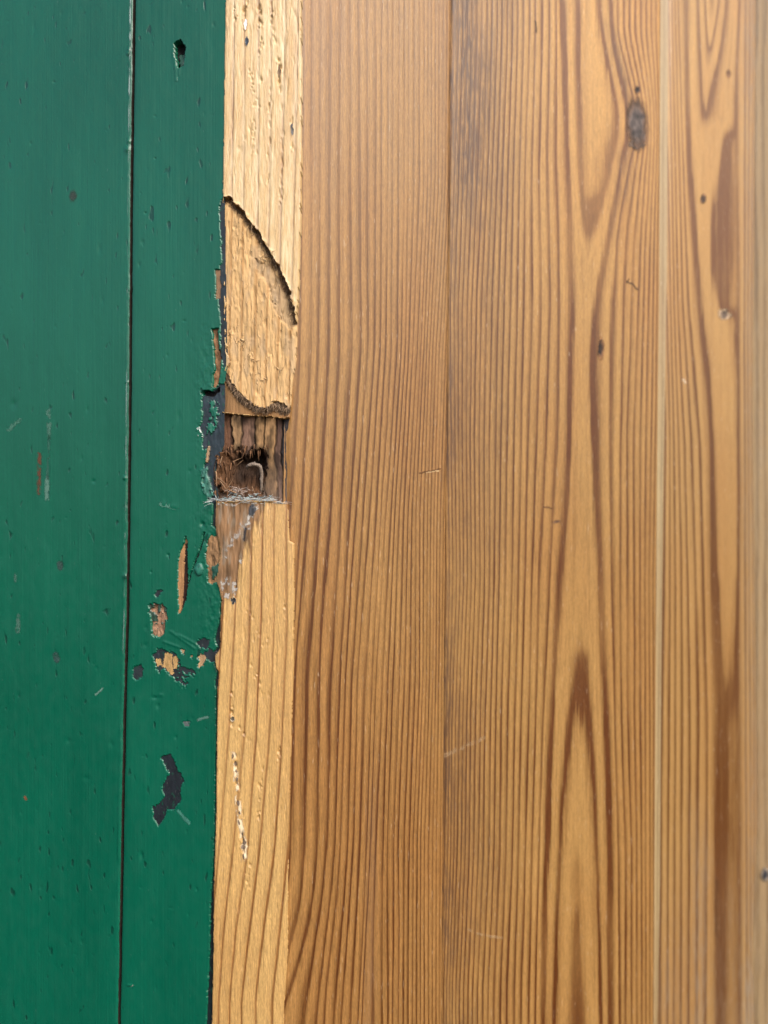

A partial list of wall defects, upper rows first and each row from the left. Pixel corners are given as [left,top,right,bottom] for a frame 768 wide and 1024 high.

spalling [197,196,298,584]
peeling [149,539,221,1024]